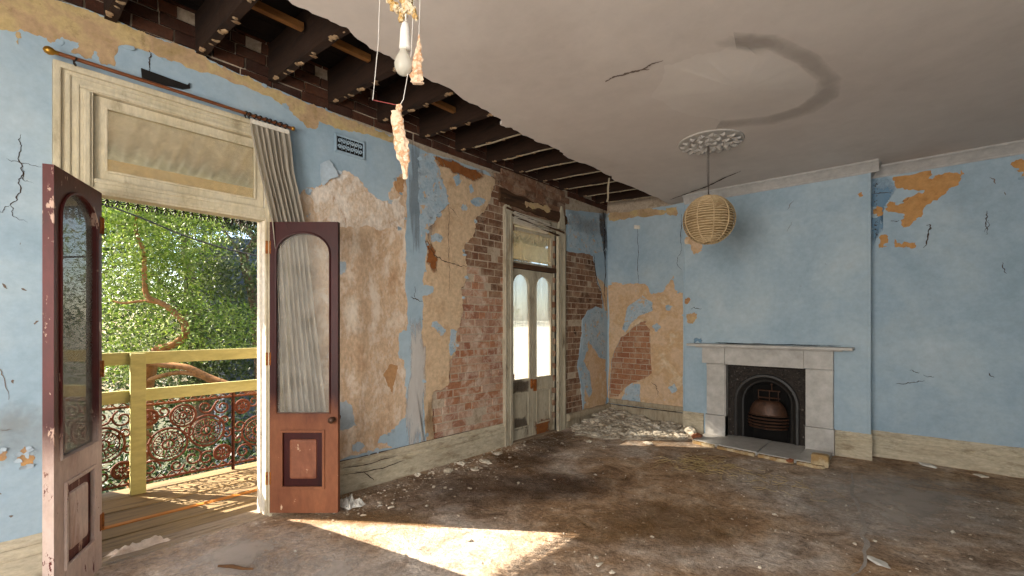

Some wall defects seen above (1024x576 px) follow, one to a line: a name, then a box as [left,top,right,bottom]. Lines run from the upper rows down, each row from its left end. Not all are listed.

crack [605,61,662,82]
crack [2,135,38,220]
peeling [0,0,697,460]
peeling [858,170,967,251]
peeling [0,446,35,470]